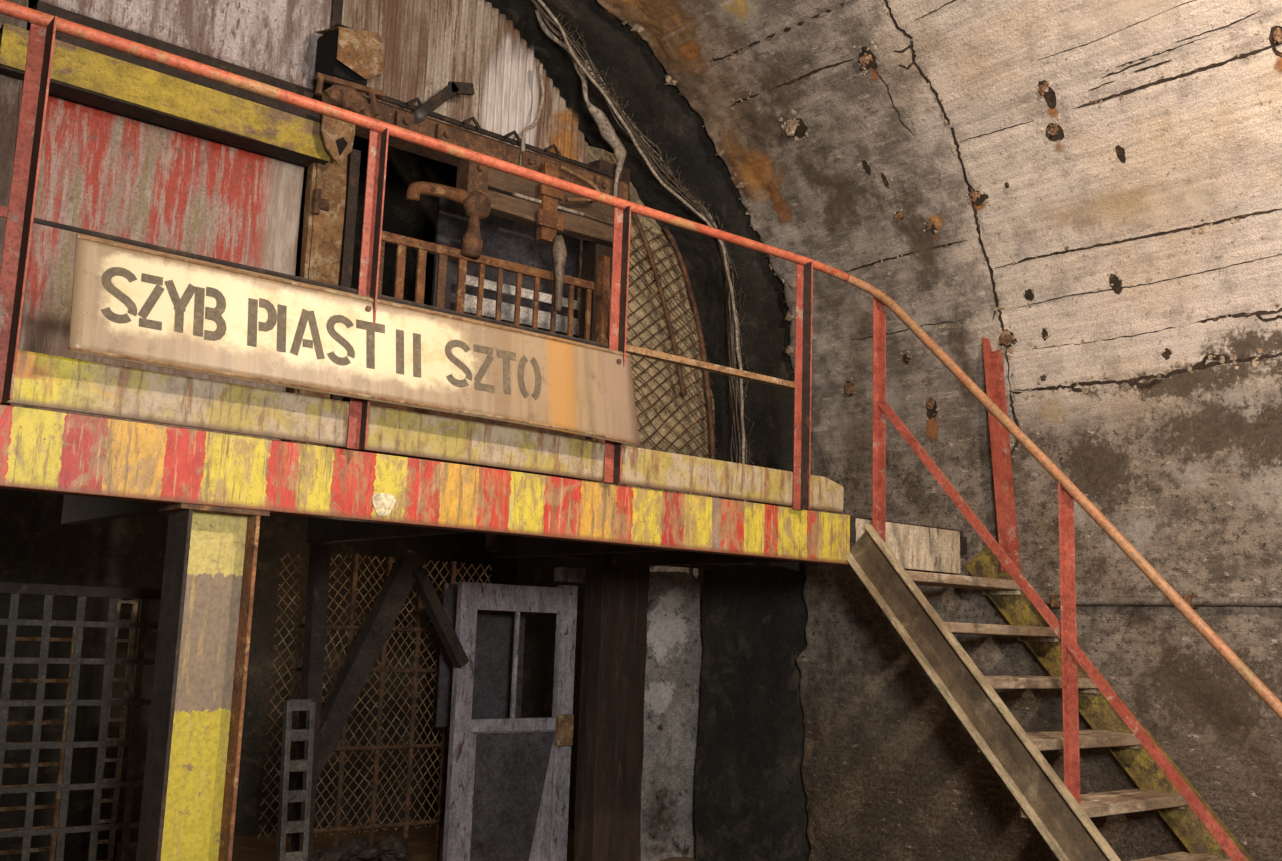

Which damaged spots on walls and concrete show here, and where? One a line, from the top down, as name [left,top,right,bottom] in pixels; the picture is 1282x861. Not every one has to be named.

rust [610,0,706,72]
crack [707,3,845,66]
rust [723,131,792,222]
crack [729,0,1282,462]